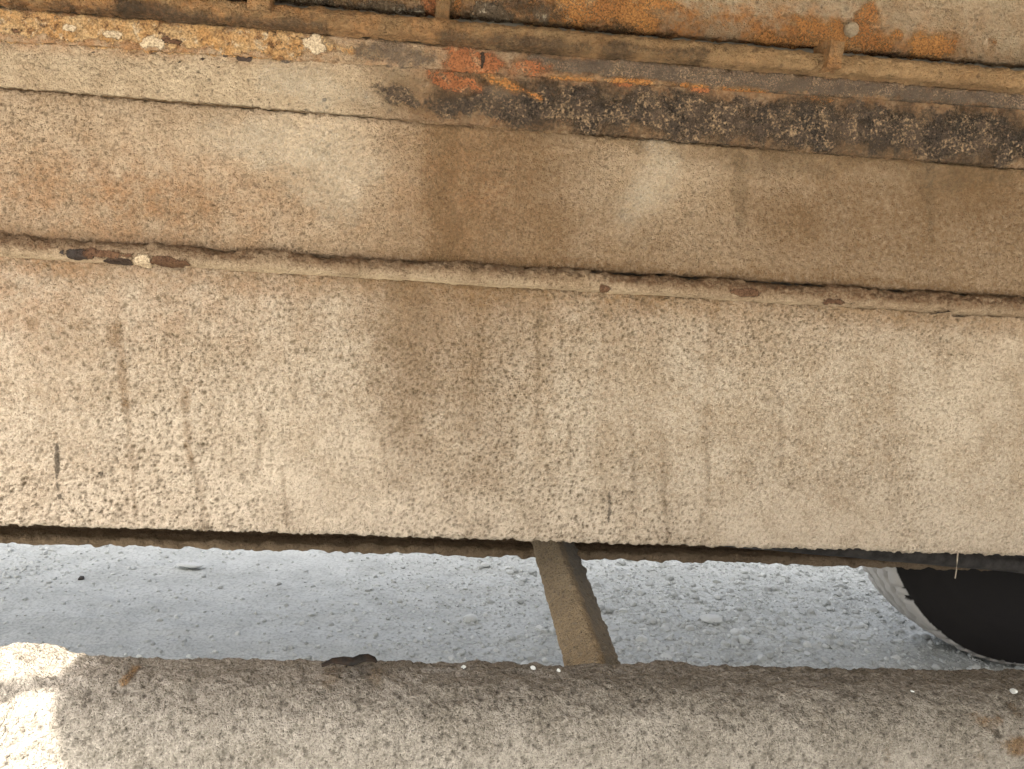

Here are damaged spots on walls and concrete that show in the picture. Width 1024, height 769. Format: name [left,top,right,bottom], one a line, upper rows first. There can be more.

corrosion [528,0,683,36]
corrosion [746,1,960,62]
corrosion [427,45,655,101]
corrosion [670,82,767,94]